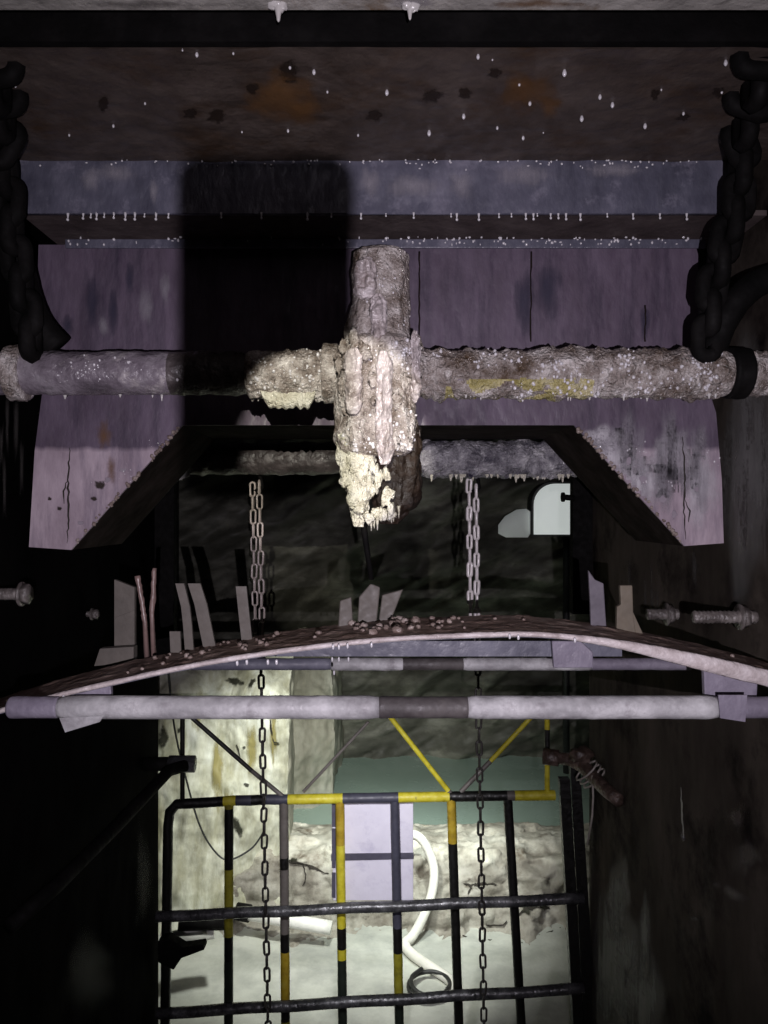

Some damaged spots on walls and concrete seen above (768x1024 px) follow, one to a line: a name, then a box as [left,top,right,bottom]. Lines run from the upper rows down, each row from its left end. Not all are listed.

corrosion [257,60,313,116]
crack [62,448,70,542]
crack [682,437,691,539]
damp [226,678,256,687]
damp [159,726,180,747]
damp [212,743,229,797]
damp [243,732,256,767]
damp [271,719,279,763]